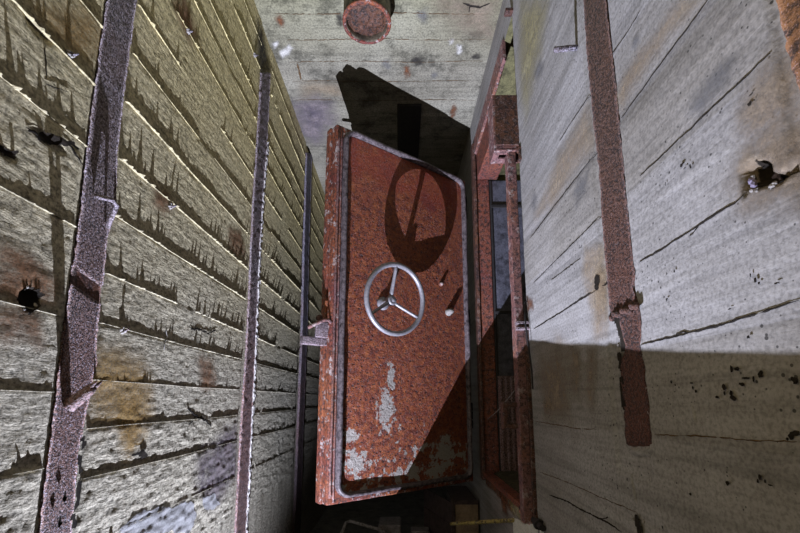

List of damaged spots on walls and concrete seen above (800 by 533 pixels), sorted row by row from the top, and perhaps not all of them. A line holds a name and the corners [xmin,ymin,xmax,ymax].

crack [640,53,770,176]
spalling [37,131,80,150]
spalling [747,159,800,195]
crack [640,193,745,262]
spalling [16,285,45,315]
crack [642,300,799,345]